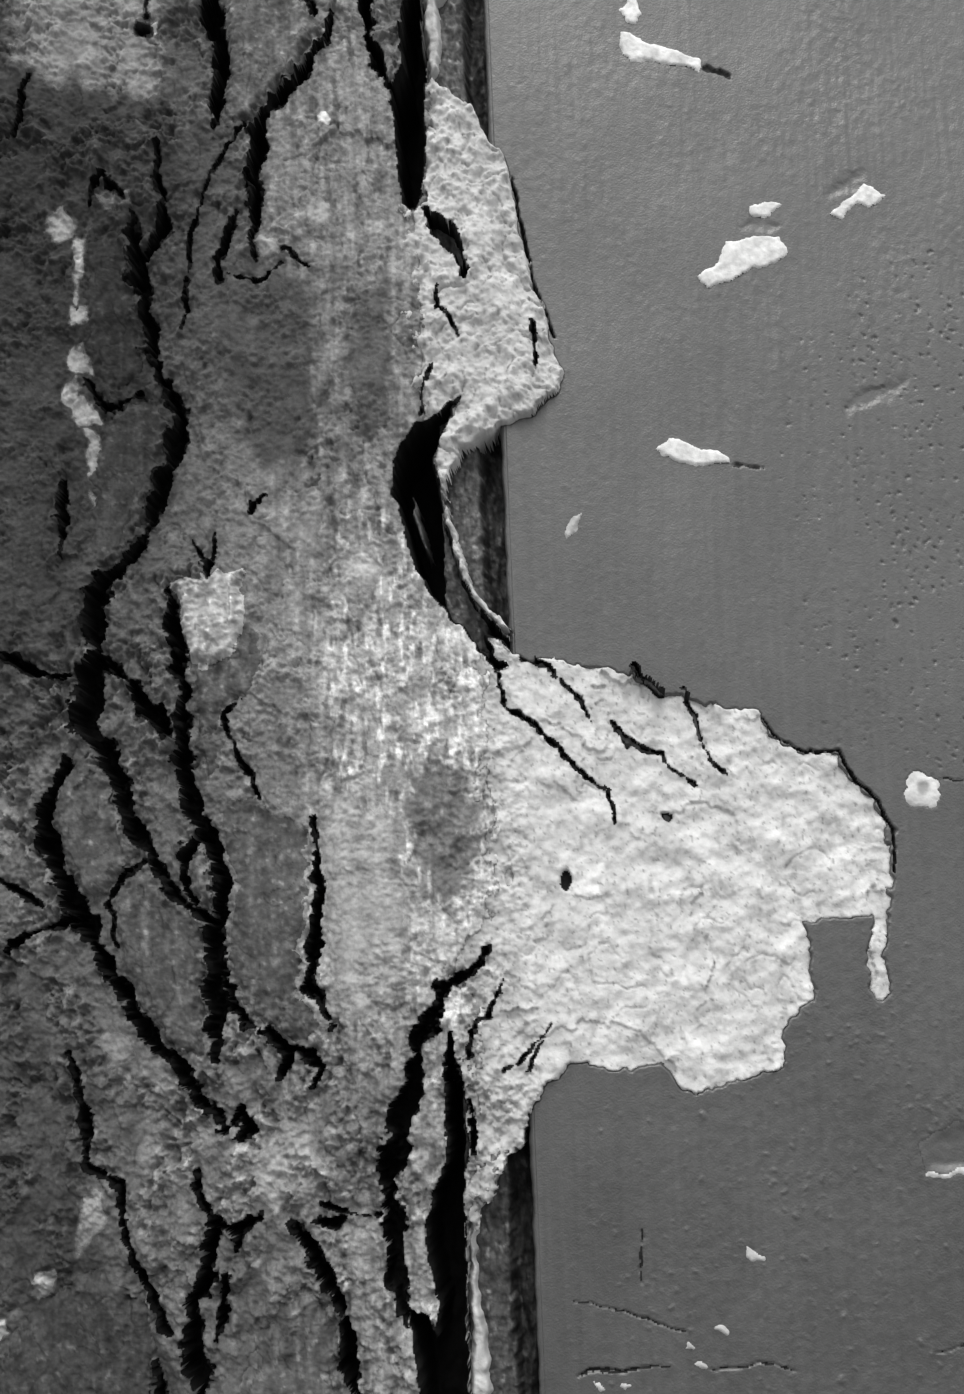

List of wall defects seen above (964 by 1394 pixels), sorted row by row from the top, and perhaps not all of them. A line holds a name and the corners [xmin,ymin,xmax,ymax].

peeling [619,0,730,79]
crack [511,177,555,366]
crack [0,0,470,1143]
crack [390,362,728,825]
flaking render [396,78,894,1231]
crack [65,944,552,1394]
crack [581,1365,670,1376]
crack [573,1300,686,1332]
crack [637,1229,645,1281]
crack [712,1362,792,1371]